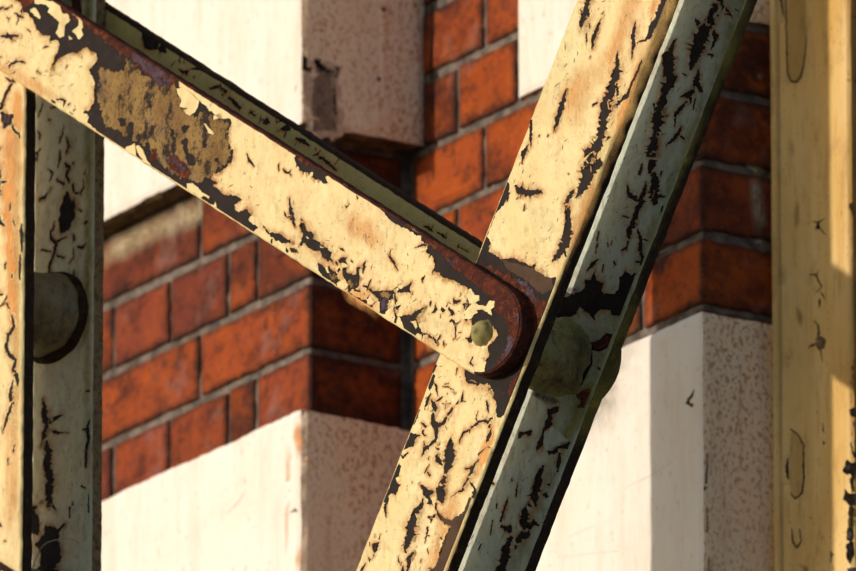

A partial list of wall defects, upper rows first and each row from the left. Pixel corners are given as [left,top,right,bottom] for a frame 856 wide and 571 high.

corrosion [71,0,82,13]
peeling [515,0,739,472]
crack [812,218,828,239]
crack [848,203,856,261]
peeling [0,0,556,571]
crack [848,357,856,419]
spalling [842,407,856,571]
crack [828,548,856,565]